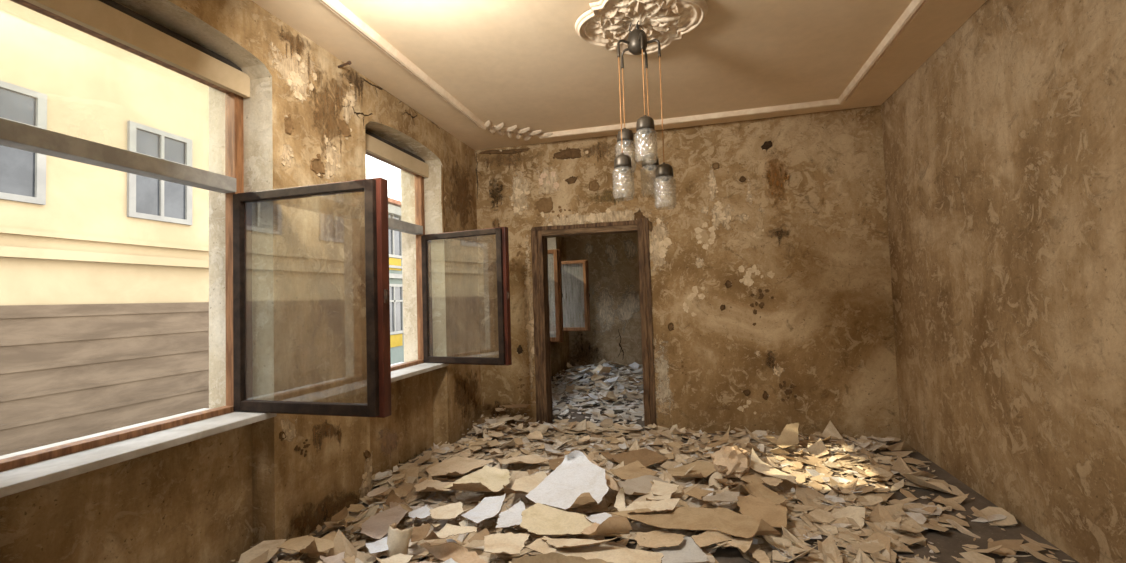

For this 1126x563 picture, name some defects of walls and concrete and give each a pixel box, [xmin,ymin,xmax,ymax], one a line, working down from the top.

flaking render [270,42,358,183]
flaking render [509,147,672,275]
flaking render [694,163,752,268]
flaking render [683,286,705,316]
flaking render [724,264,775,326]